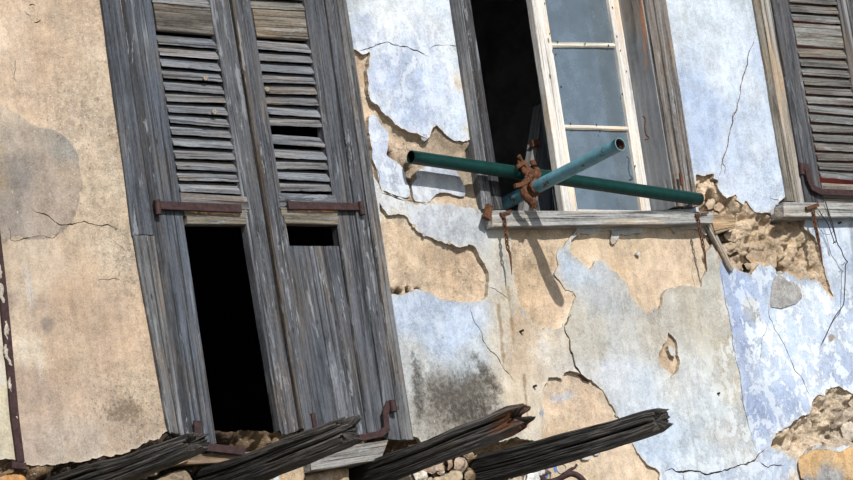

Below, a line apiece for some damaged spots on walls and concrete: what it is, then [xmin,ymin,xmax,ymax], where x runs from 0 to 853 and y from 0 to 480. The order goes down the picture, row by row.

crack [360,42,453,54]
spalling [354,52,469,185]
spalling [396,170,478,209]
spalling [380,210,486,302]
spalling [508,175,832,330]
water stain [413,356,498,421]
spalling [659,335,677,378]
spalling [462,372,618,480]
spalling [771,387,853,457]
spalling [543,443,658,480]
crack [663,449,782,475]